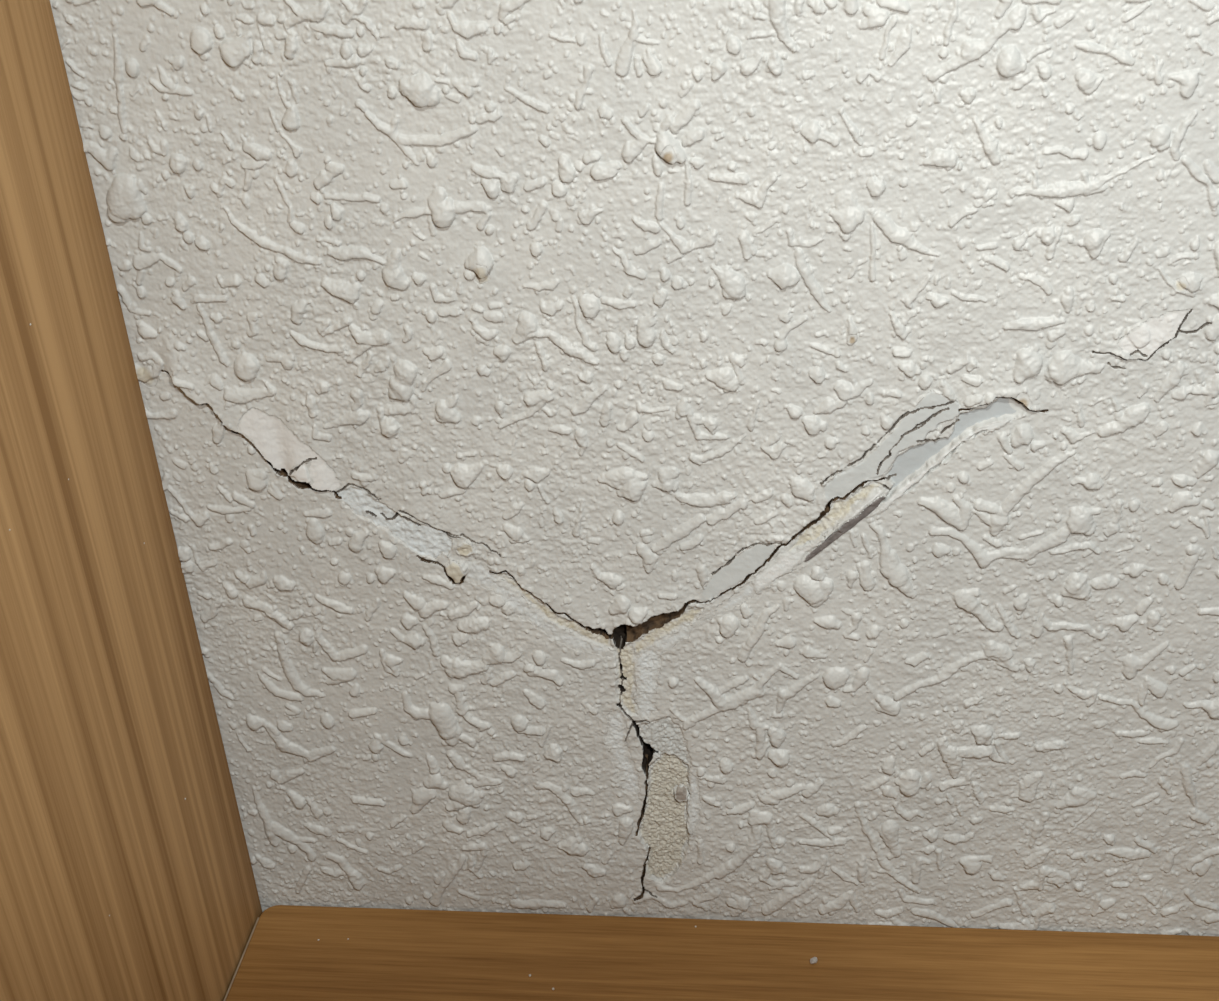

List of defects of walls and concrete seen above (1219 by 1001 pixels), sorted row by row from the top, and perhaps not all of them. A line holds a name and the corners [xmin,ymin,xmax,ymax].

crack [1092,309,1212,369]
crack [202,397,1048,901]
spalling [238,390,1026,882]